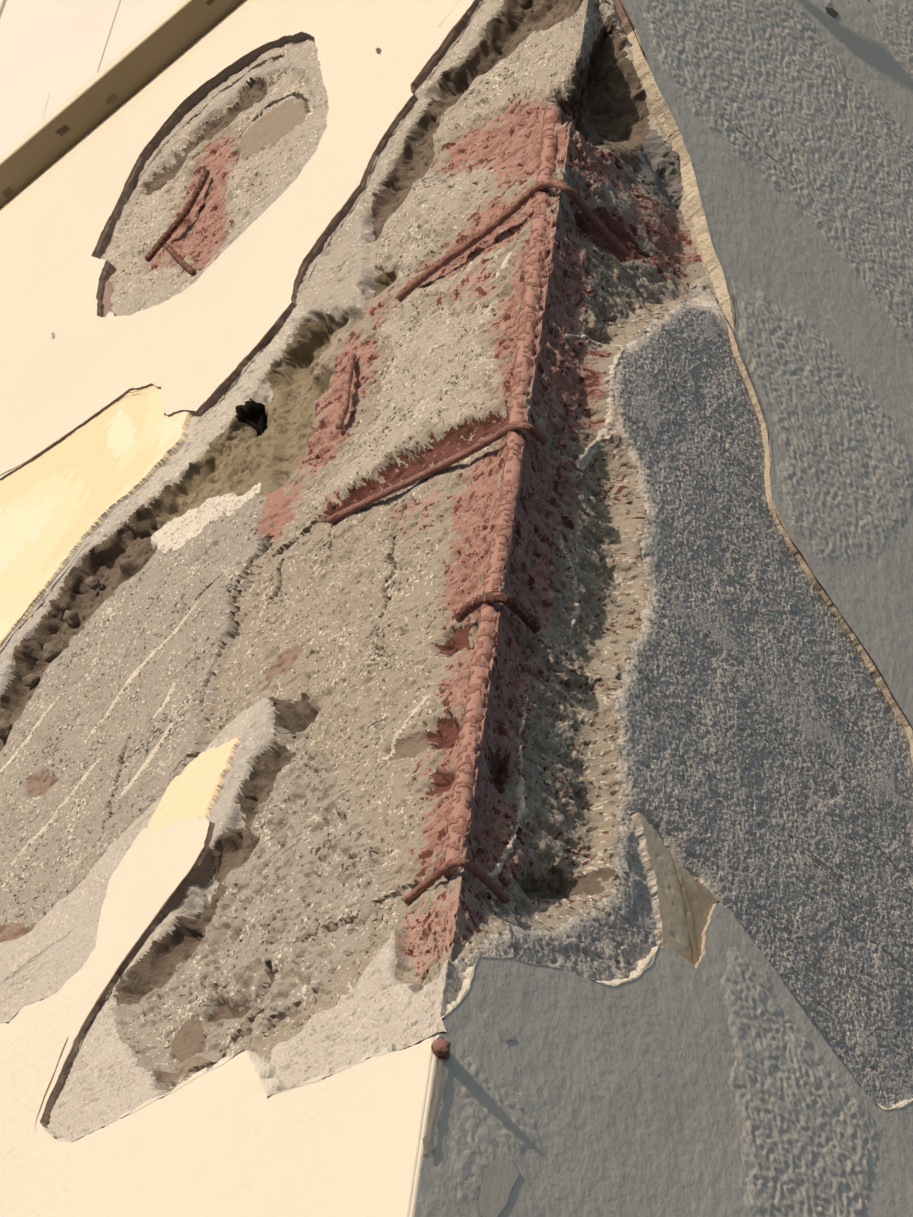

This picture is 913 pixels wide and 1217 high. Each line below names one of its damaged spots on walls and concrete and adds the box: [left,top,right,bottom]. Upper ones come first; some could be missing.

flaking render [824,0,839,18]
rust [137,123,243,278]
spalling [0,0,730,1142]
rust [251,83,706,982]
flaking render [876,1098,913,1110]